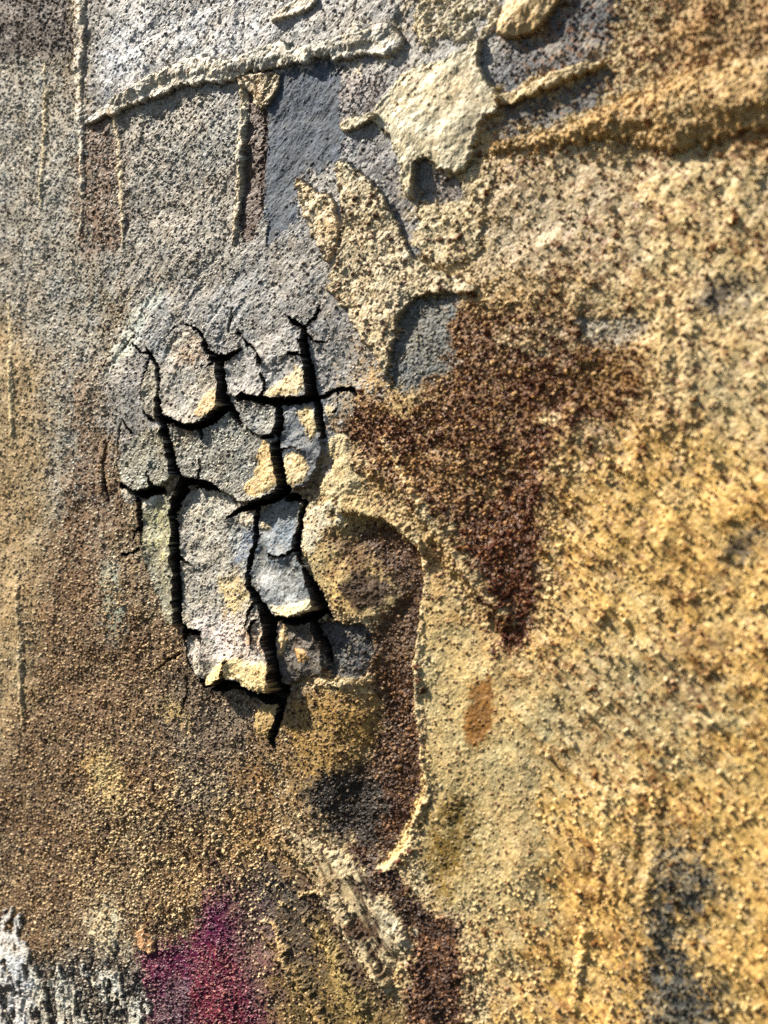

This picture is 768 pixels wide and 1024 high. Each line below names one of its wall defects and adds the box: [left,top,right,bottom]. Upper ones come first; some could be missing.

flaking render [271,0,319,22]
flaking render [237,38,604,403]
flaking render [569,313,649,351]
crack [104,307,356,738]
rust [331,297,652,1024]